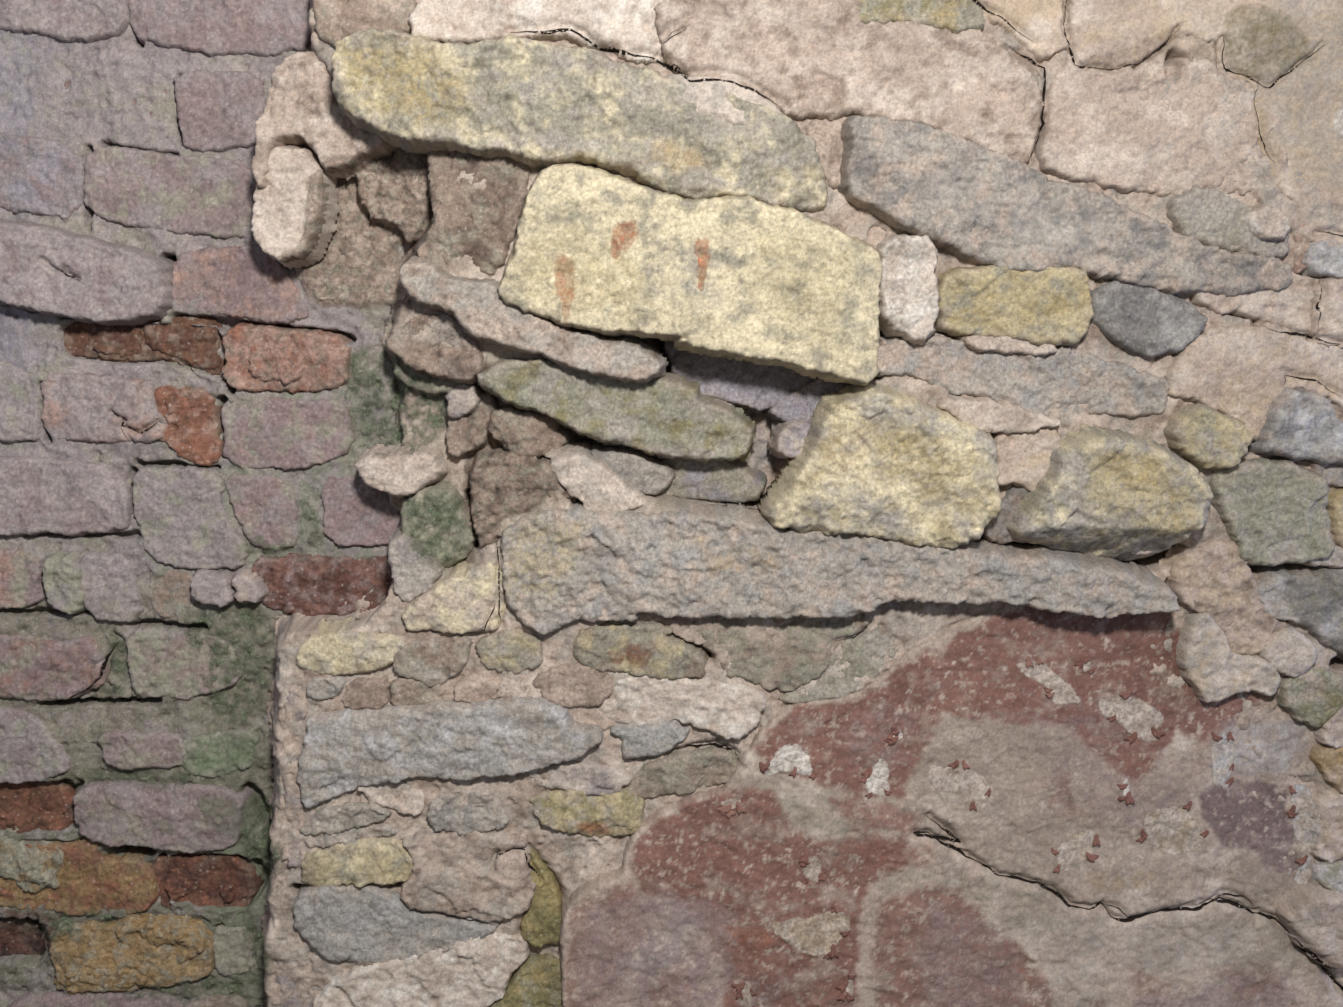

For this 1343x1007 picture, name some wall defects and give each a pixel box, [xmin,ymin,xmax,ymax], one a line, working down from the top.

crack [514,24,780,107]
crack [972,0,1175,161]
crack [913,818,1343,991]